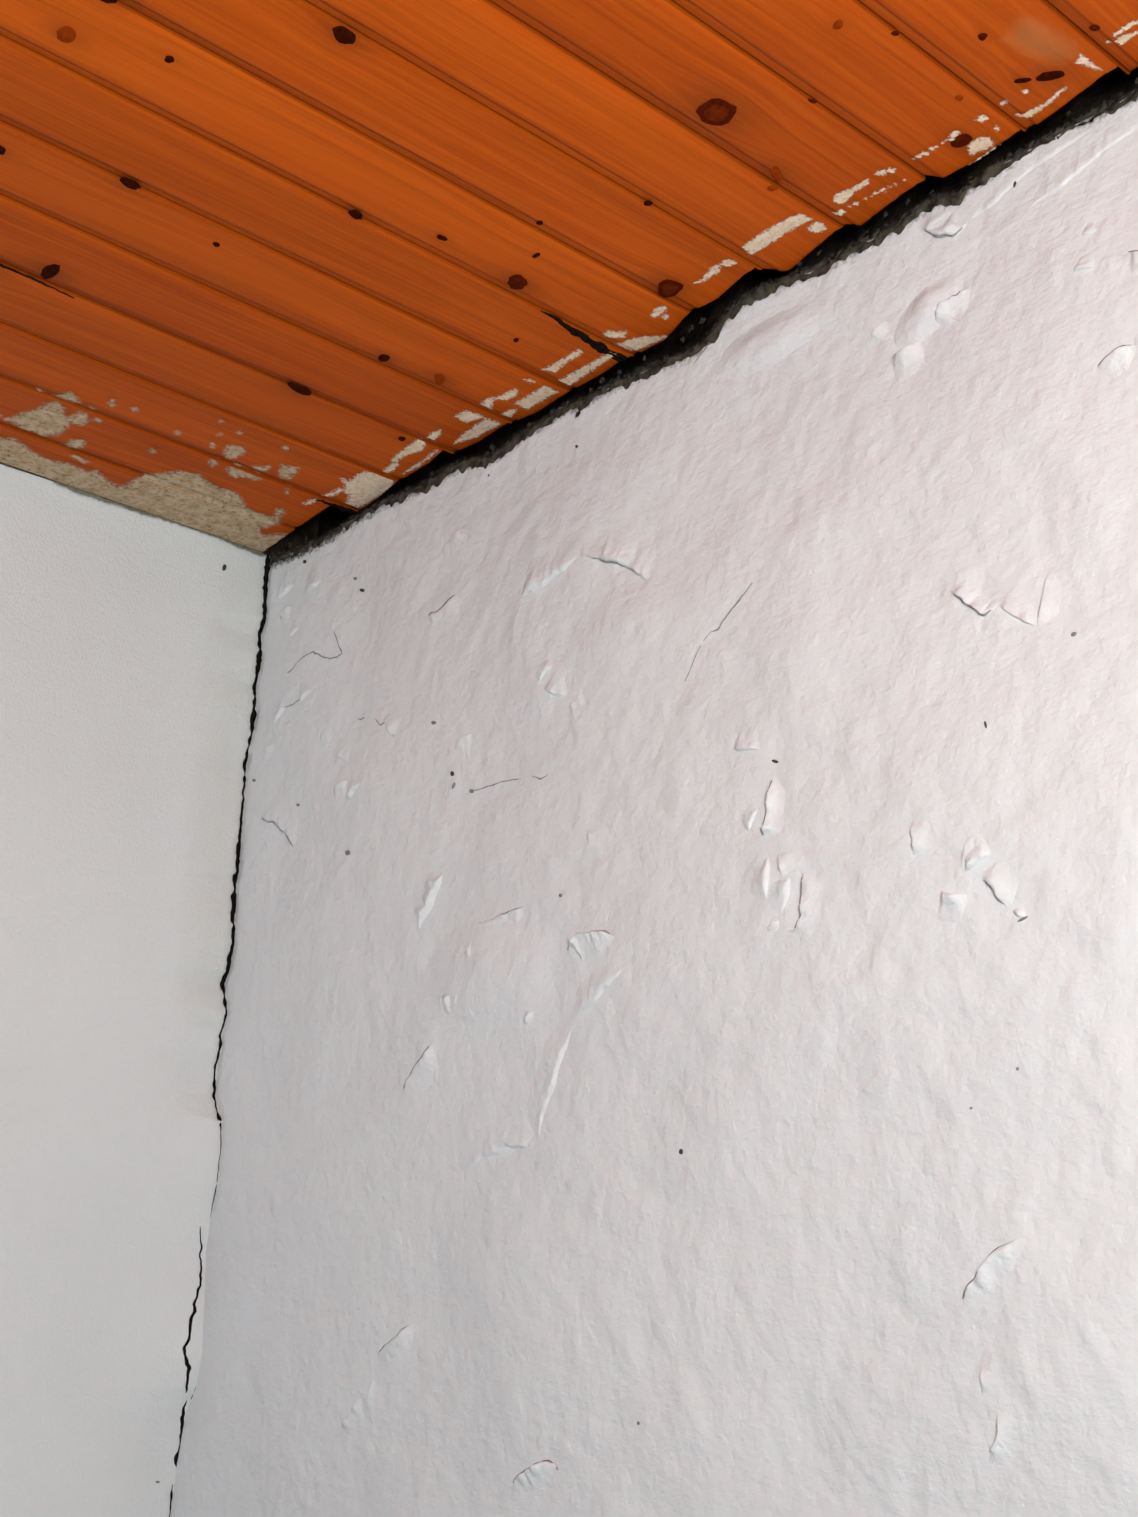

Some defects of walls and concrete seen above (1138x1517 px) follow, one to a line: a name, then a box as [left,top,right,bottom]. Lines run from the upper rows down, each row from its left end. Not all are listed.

peeling [1106,20,1138,45]
peeling [1075,54,1103,71]
crack [924,227,963,238]
spalling [269,77,1138,566]
crack [169,555,342,1517]